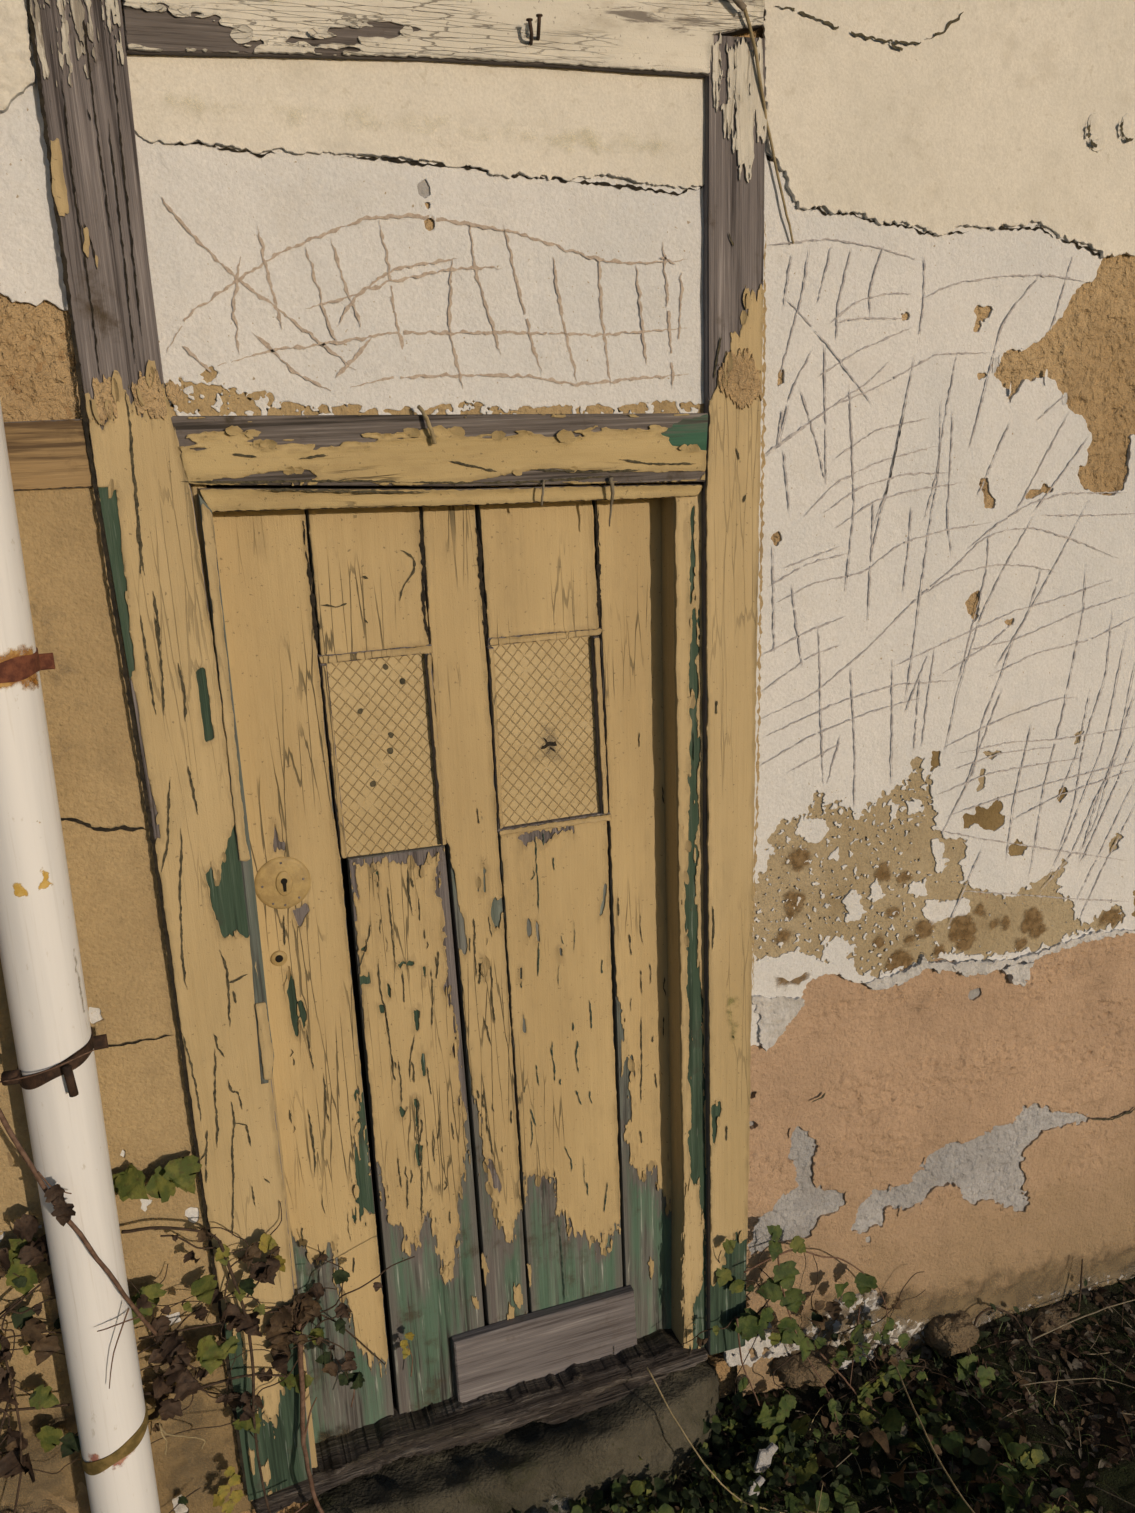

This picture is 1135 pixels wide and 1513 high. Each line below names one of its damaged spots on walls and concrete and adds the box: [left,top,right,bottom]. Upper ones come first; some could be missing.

peeling [0,0,765,452]
flaking render [977,254,1135,496]
peeling [212,466,393,485]
peeling [423,466,705,486]
flaking render [979,478,994,508]
corrosion [0,646,33,663]
corrosion [0,673,38,689]
peeling [196,667,214,742]
peeling [518,826,574,846]
peeling [206,824,249,939]
flaking render [684,506,1135,1370]
peeling [224,848,672,1501]